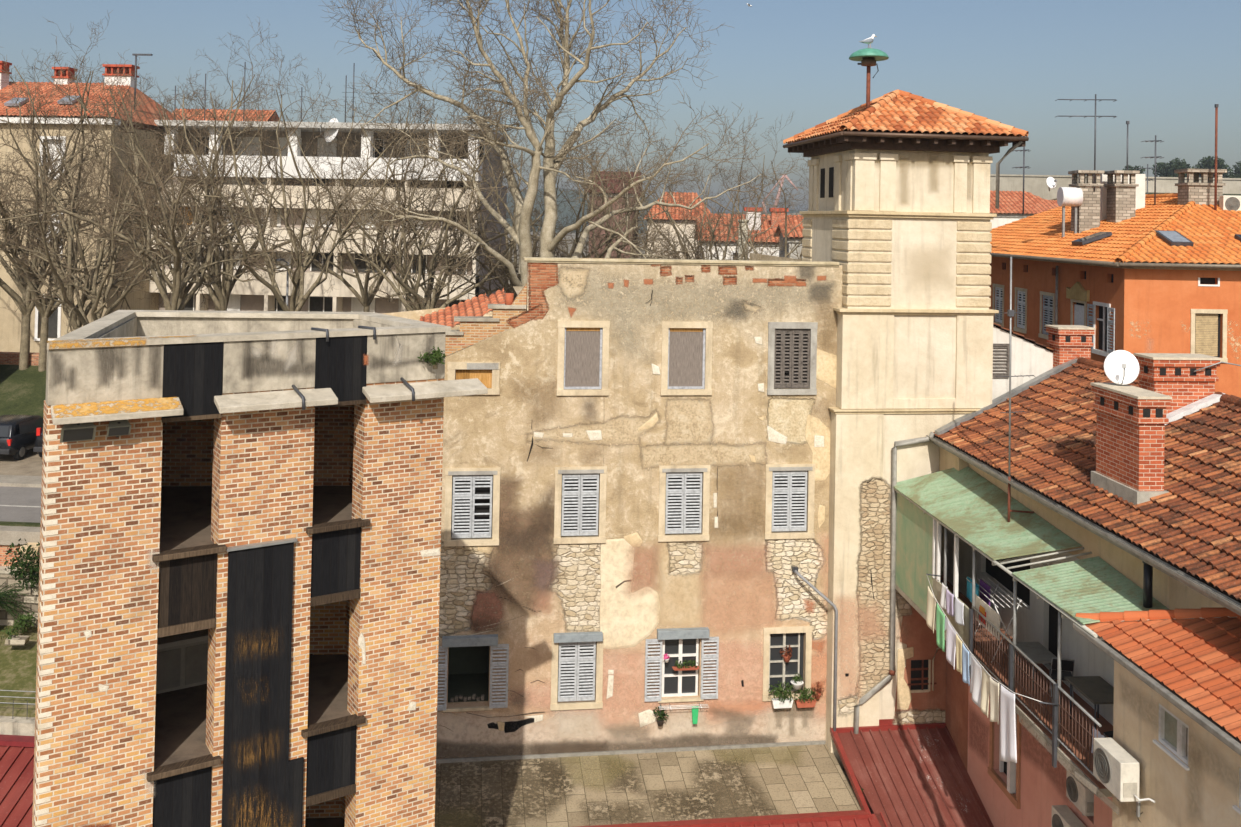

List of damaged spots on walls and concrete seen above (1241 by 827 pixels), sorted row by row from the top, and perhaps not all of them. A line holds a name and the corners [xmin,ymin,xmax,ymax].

flaking render [506,262,558,328]
flaking render [644,264,826,286]
peeling [358,633,366,664]
spalling [420,543,503,637]
damp [490,480,555,609]
spalling [487,478,945,733]